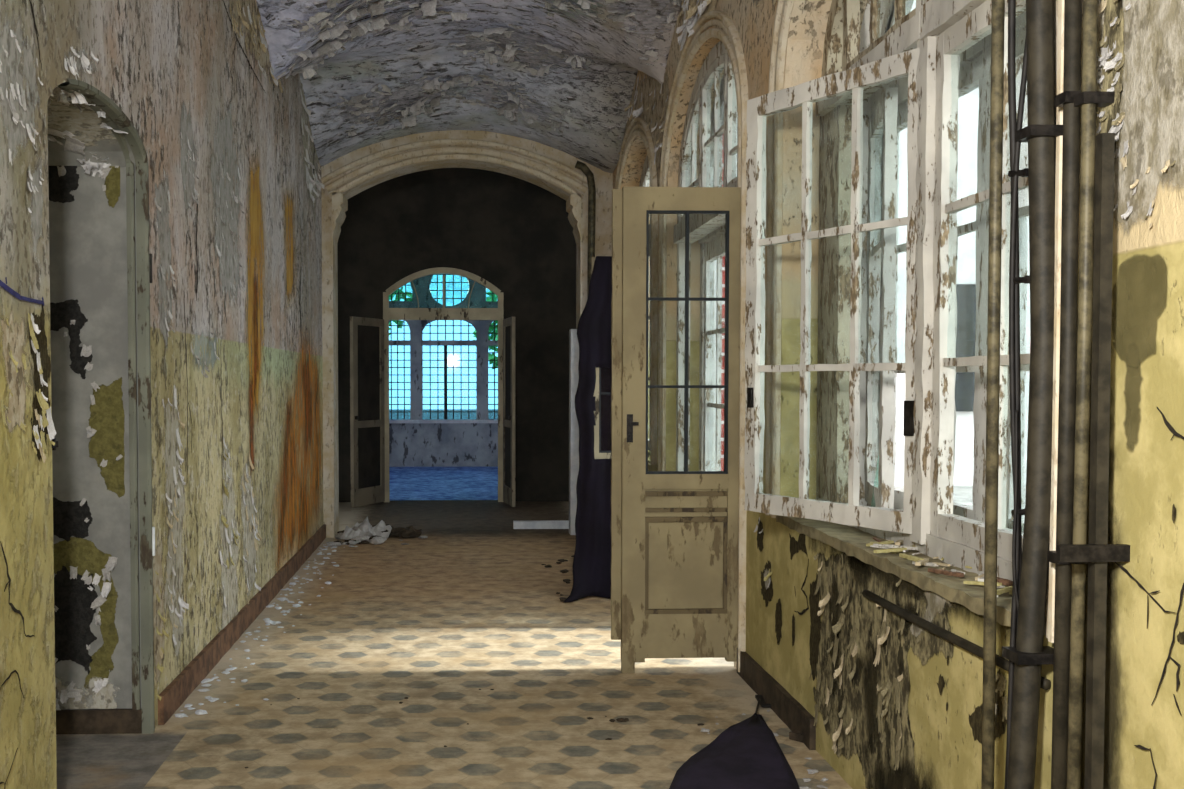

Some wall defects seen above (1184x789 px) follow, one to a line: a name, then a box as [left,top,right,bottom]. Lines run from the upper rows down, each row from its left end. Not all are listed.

peeling [229,0,596,228]
peeling [1096,0,1184,232]
flaking render [1,296,125,498]
rust [247,167,264,469]
rust [278,345,321,568]
water stain [1111,254,1167,451]
crack [1157,407,1184,440]
crack [0,541,34,637]
flaking render [53,497,120,710]
spalling [789,533,954,789]
crack [1134,745,1157,789]
crack [1115,562,1184,716]